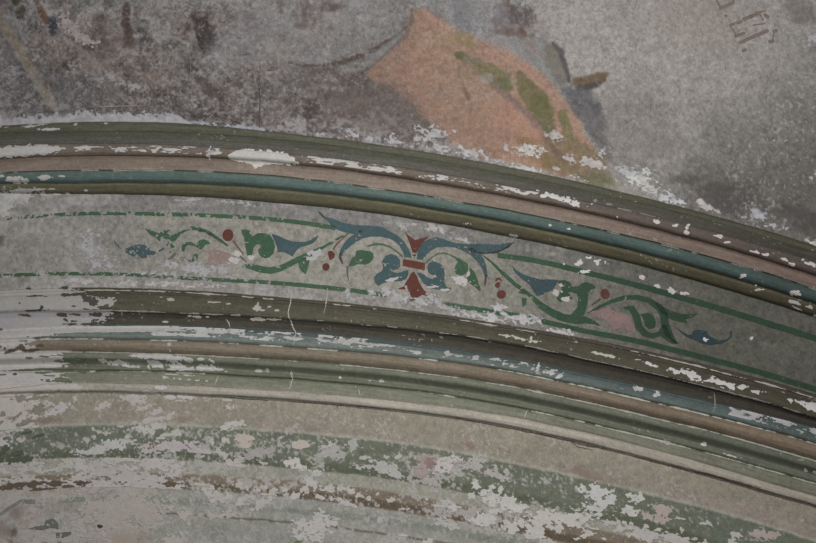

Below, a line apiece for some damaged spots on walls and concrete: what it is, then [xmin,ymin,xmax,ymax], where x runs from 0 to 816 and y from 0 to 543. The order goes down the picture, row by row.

peeling [0,109,265,131]
peeling [0,144,78,159]
spalling [109,145,299,169]
peeling [339,123,564,172]
peeling [0,172,70,218]
peeling [419,174,486,189]
peeling [536,190,593,207]
peeling [553,147,721,214]
peeling [563,256,606,274]
peeling [0,277,707,543]
peeling [454,347,816,445]
spalling [486,382,816,484]